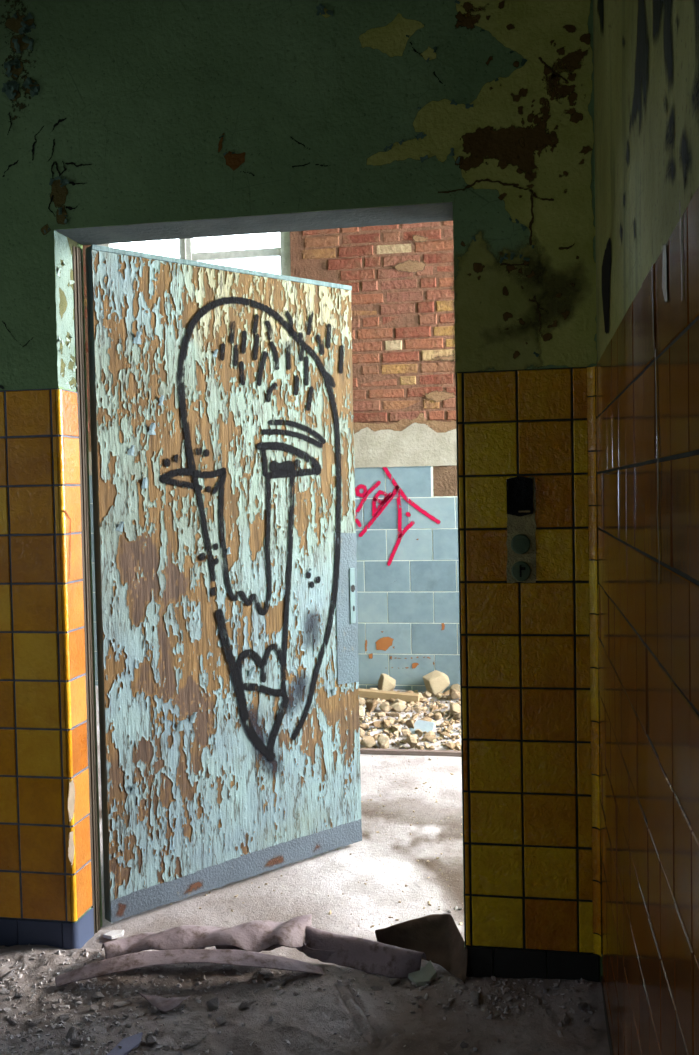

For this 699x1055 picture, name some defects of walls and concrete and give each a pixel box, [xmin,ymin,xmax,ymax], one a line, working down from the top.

water stain [455,0,604,200]
crack [2,118,92,214]
flaking render [41,176,70,235]
crack [438,178,554,266]
water stain [500,252,579,359]
peeling [57,0,611,901]